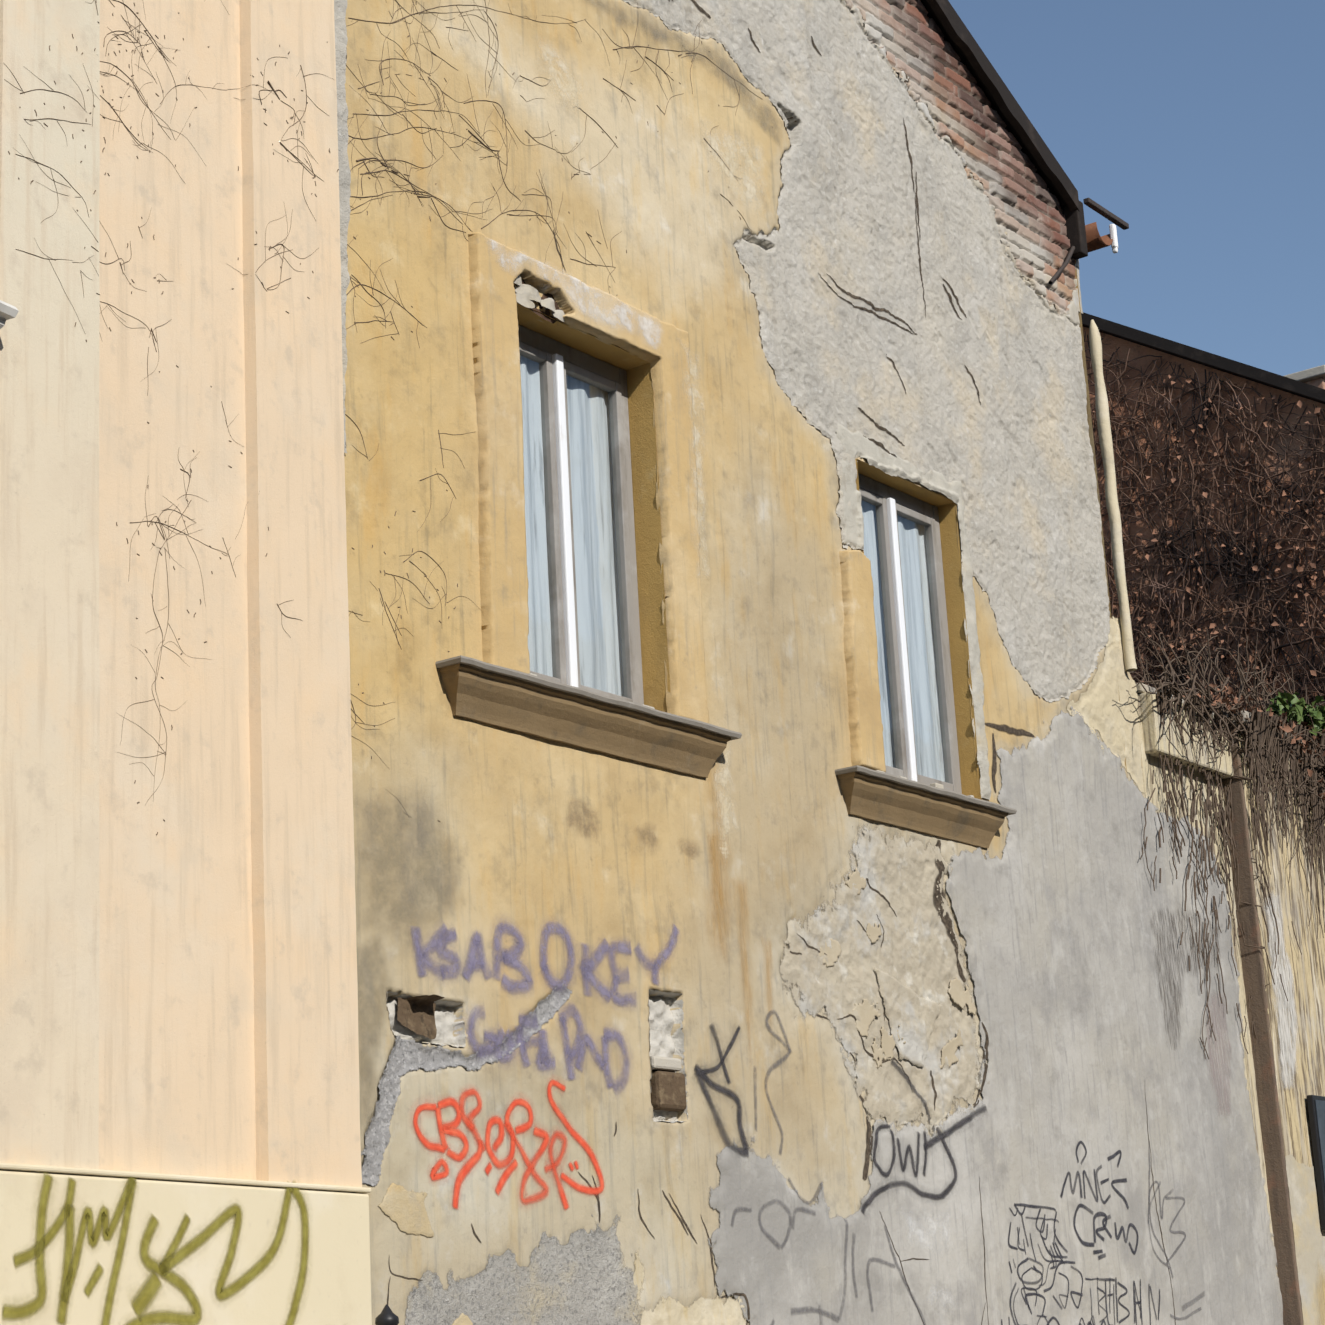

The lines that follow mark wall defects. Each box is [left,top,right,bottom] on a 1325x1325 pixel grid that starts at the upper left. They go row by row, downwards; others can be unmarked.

spalling [514,275,565,324]
spalling [623,0,1145,794]
peeling [779,823,989,1135]
peeling [361,983,572,1186]
peeling [405,1215,747,1325]